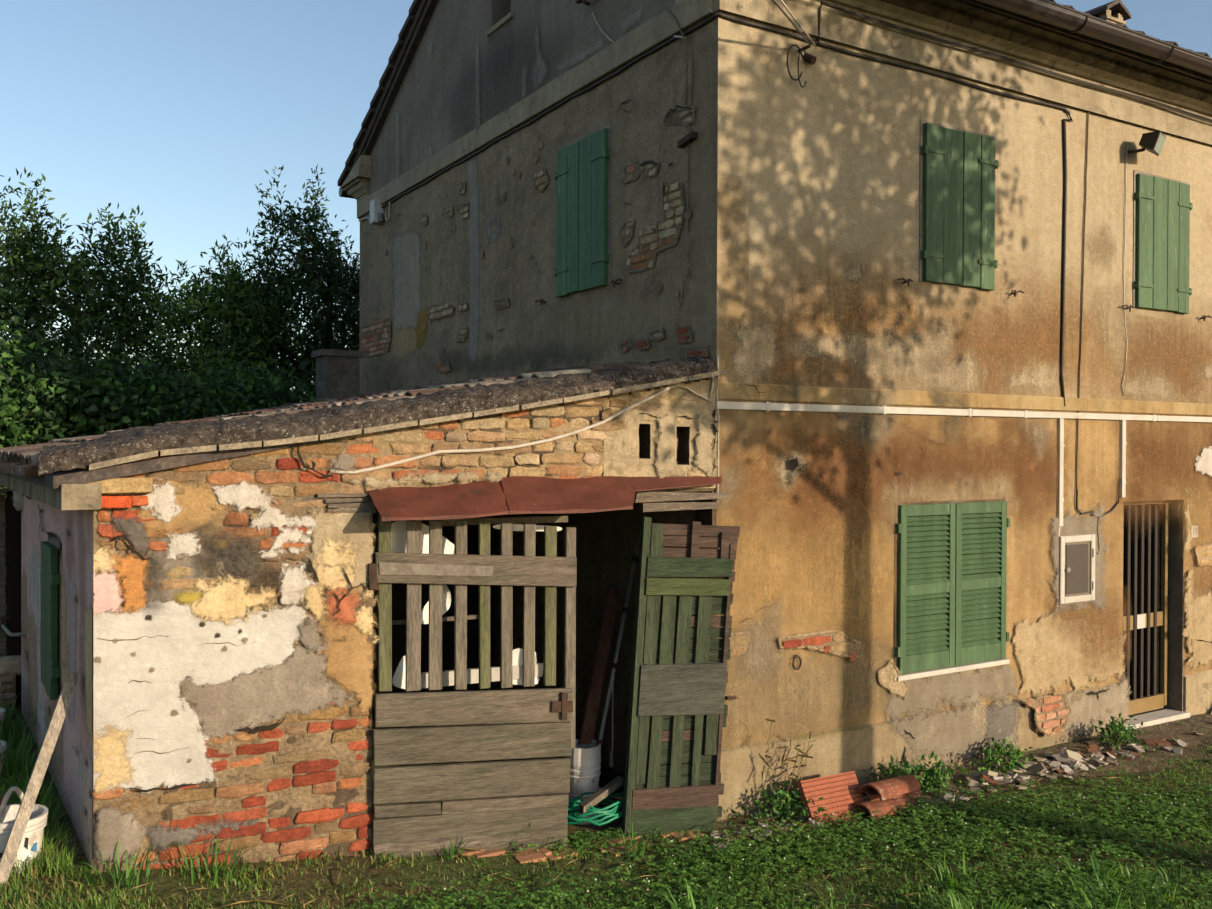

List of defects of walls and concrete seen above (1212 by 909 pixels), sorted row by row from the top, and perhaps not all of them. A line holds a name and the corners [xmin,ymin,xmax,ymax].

flaking render [625,160,685,274]
flaking render [360,317,391,357]
damp [764,280,1212,442]
flaking render [780,453,807,482]
flaking render [1195,446,1212,476]
flaking render [1183,487,1212,669]
peeling [21,543,313,816]
flaking render [778,630,863,661]
flaking render [878,659,909,700]
flaking render [1013,604,1127,737]